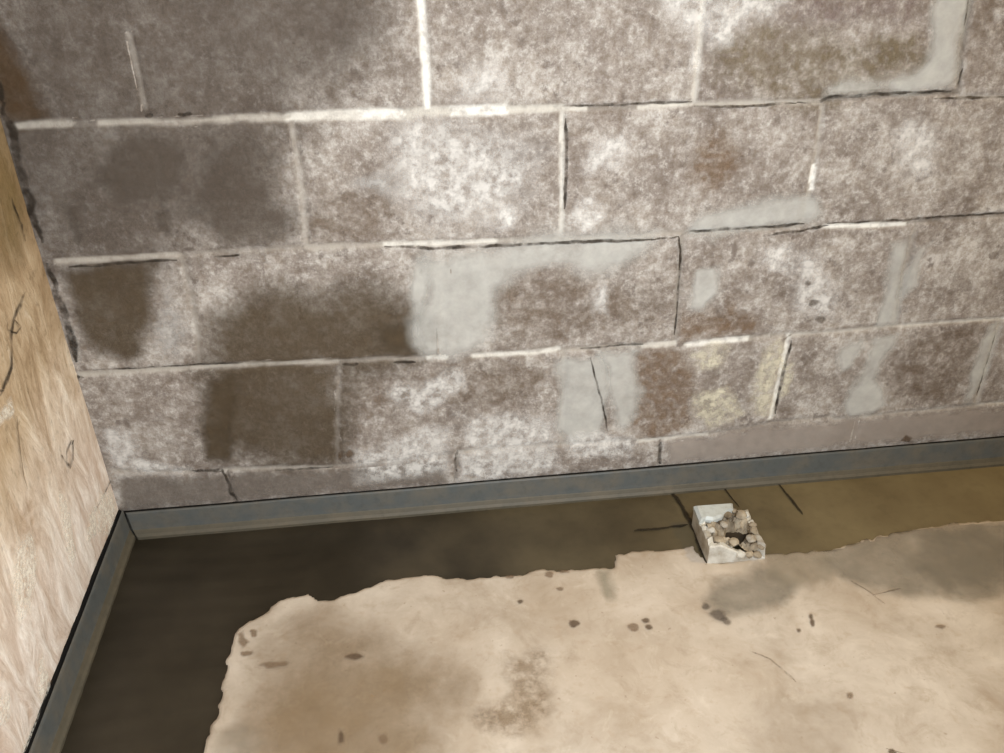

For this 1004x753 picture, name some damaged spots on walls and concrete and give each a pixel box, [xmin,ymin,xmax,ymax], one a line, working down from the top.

crack [3,305,22,390]
leakage [70,265,149,358]
leakage [205,268,426,464]
leakage [107,430,166,471]